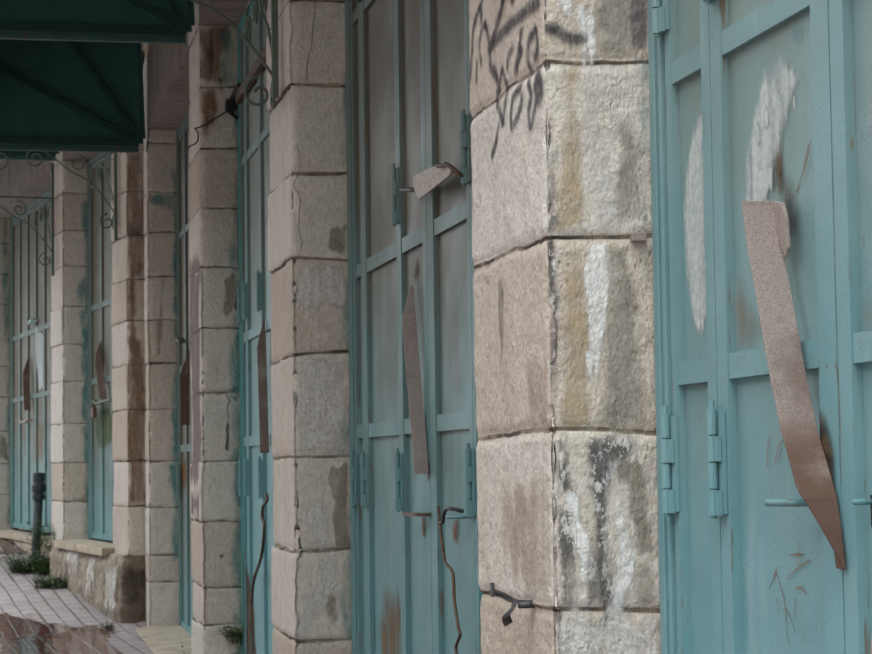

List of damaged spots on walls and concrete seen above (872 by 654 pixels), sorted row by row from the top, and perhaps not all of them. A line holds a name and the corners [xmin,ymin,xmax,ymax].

crack [293,146,302,251]
leakage [559,460,657,654]
corrosion [382,595,400,654]